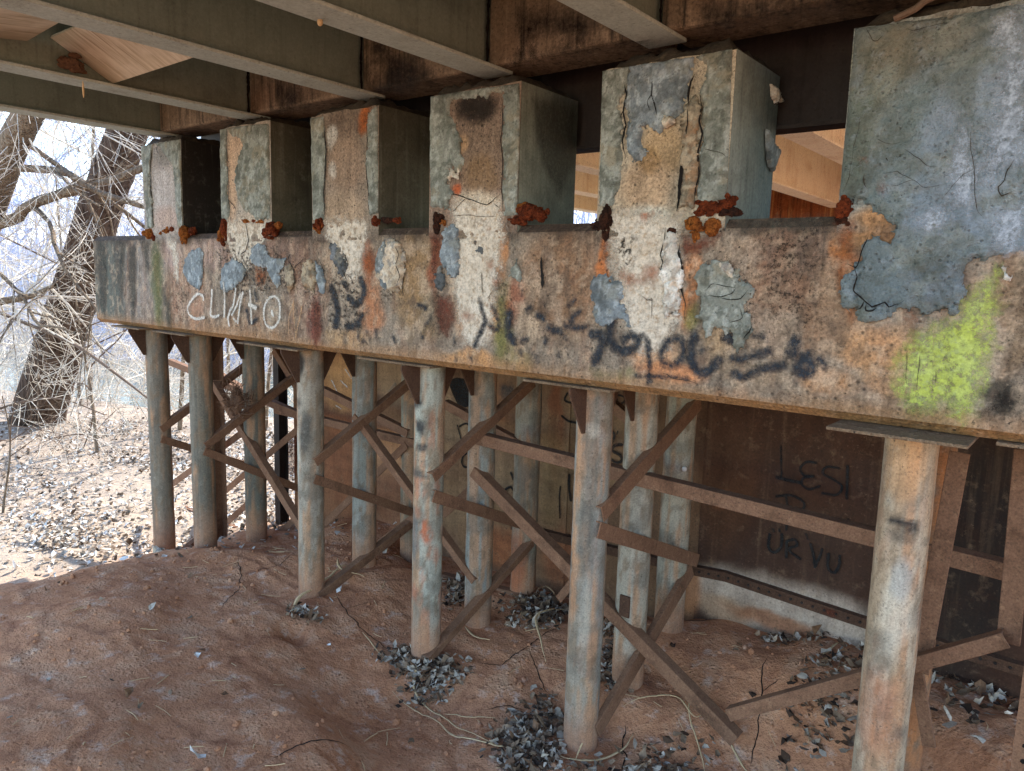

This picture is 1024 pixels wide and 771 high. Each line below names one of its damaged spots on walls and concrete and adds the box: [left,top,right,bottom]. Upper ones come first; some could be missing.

peeling [599,49,733,212]
peeling [838,4,1024,323]
peeling [218,242,363,334]
spalling [434,224,460,335]
spalling [590,273,631,328]
spalling [658,227,818,354]